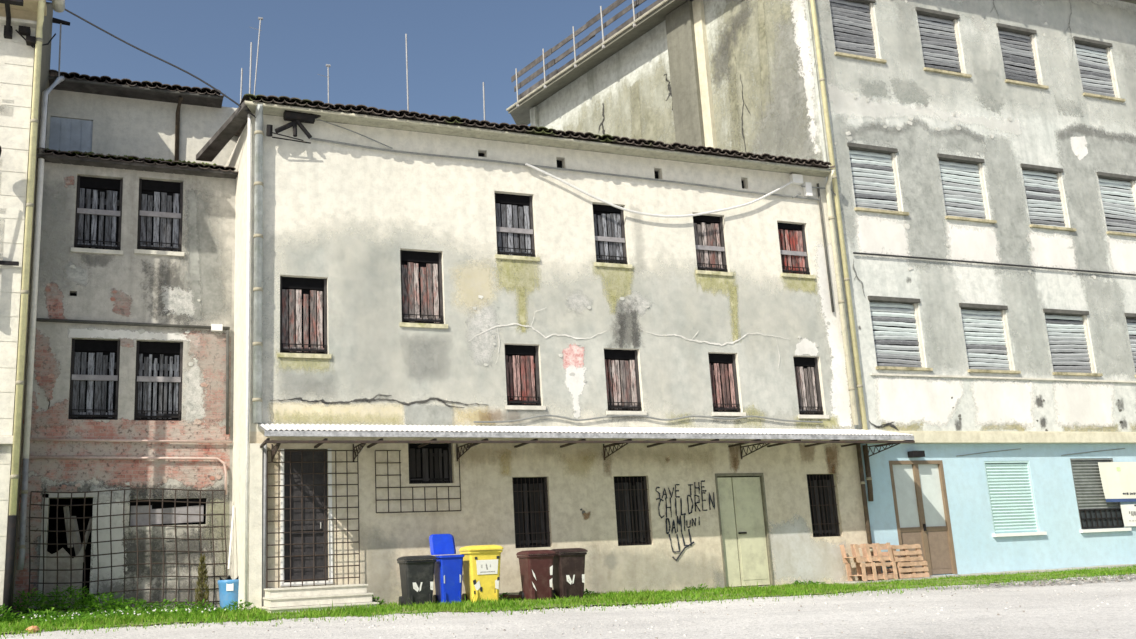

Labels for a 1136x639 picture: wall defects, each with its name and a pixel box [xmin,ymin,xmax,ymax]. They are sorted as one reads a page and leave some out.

crack [598,103,606,135]
crack [740,74,750,152]
damp [718,0,813,160]
flaking render [14,282,233,612]
crack [270,394,489,408]
damp [269,228,836,424]